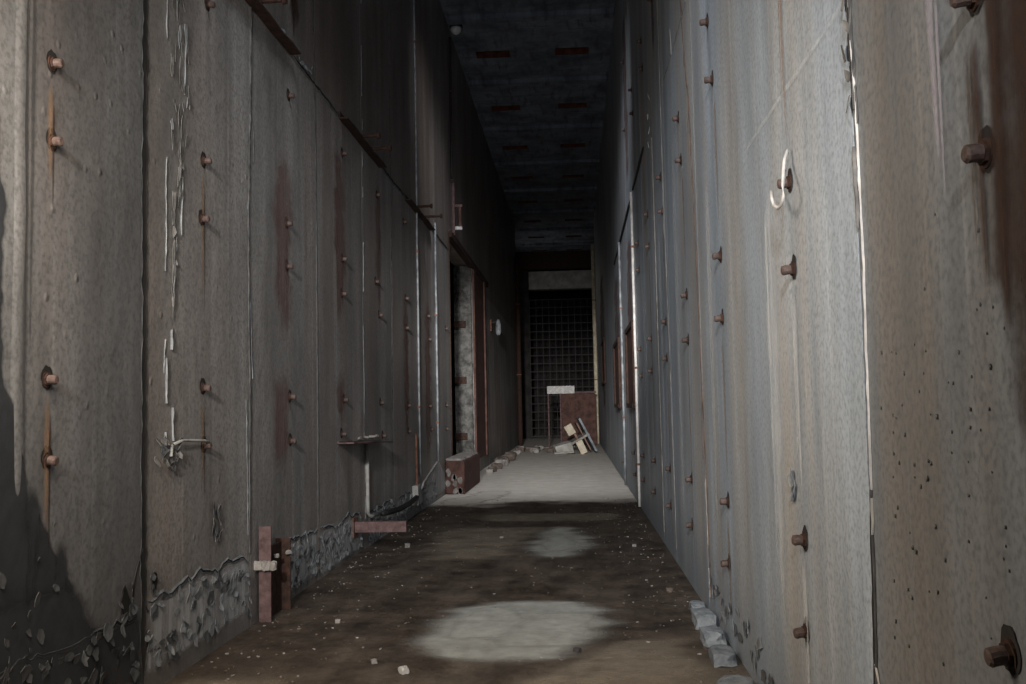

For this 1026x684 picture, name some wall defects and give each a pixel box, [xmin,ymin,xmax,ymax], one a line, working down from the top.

peeling [289,480,438,587]